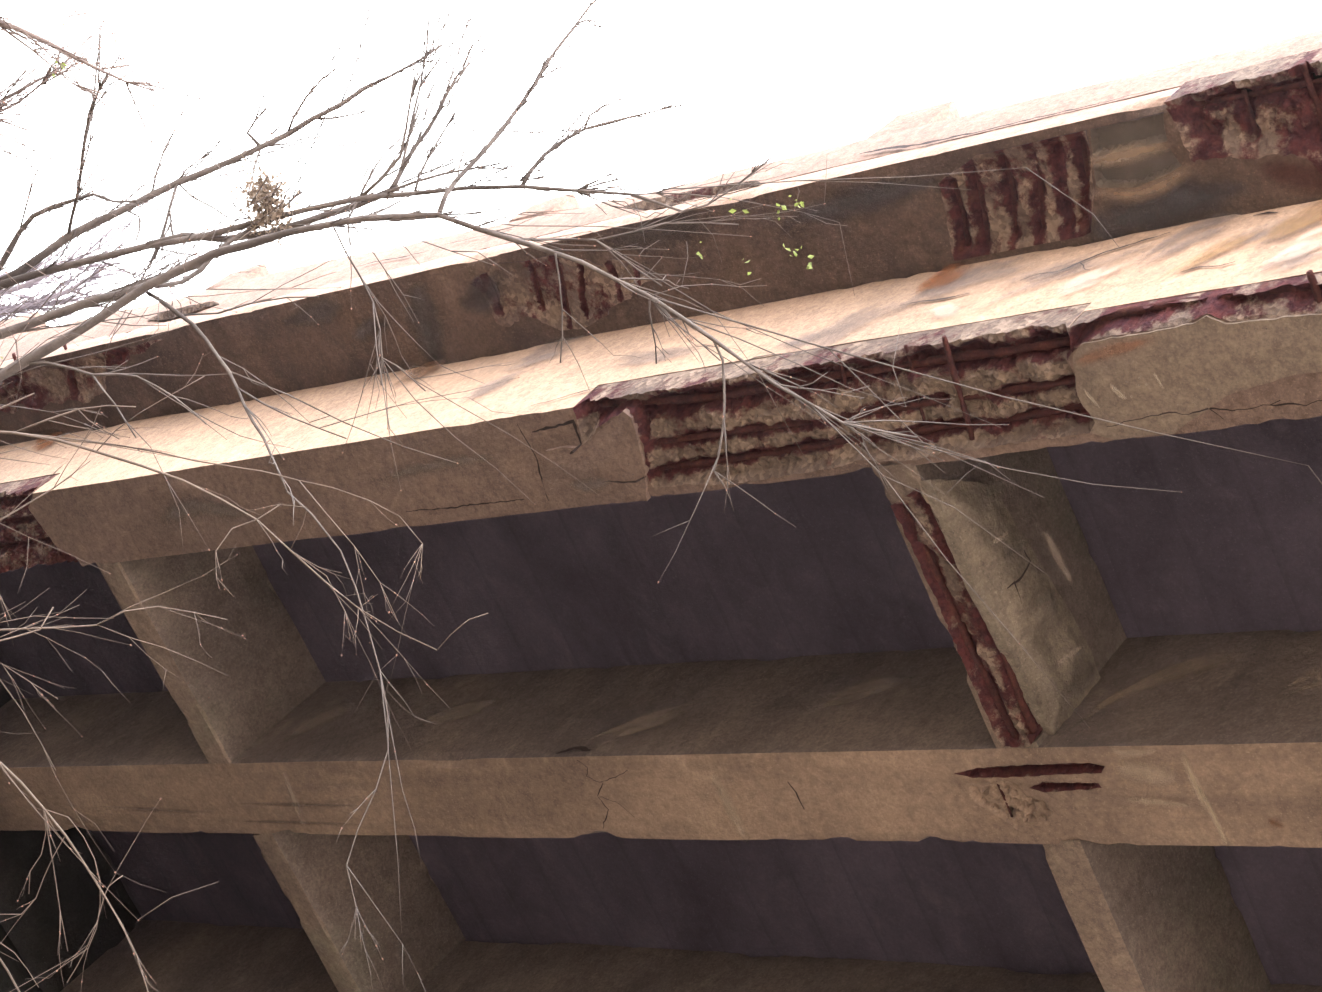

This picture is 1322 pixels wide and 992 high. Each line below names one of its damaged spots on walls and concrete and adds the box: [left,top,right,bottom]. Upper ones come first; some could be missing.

spalling [938,48,1322,261]
spalling [471,255,652,331]
crack [406,385,603,512]
spalling [542,270,1322,509]
crack [1107,400,1322,427]
spalling [0,474,82,574]
spalling [890,488,1043,748]
spalling [955,763,1104,792]